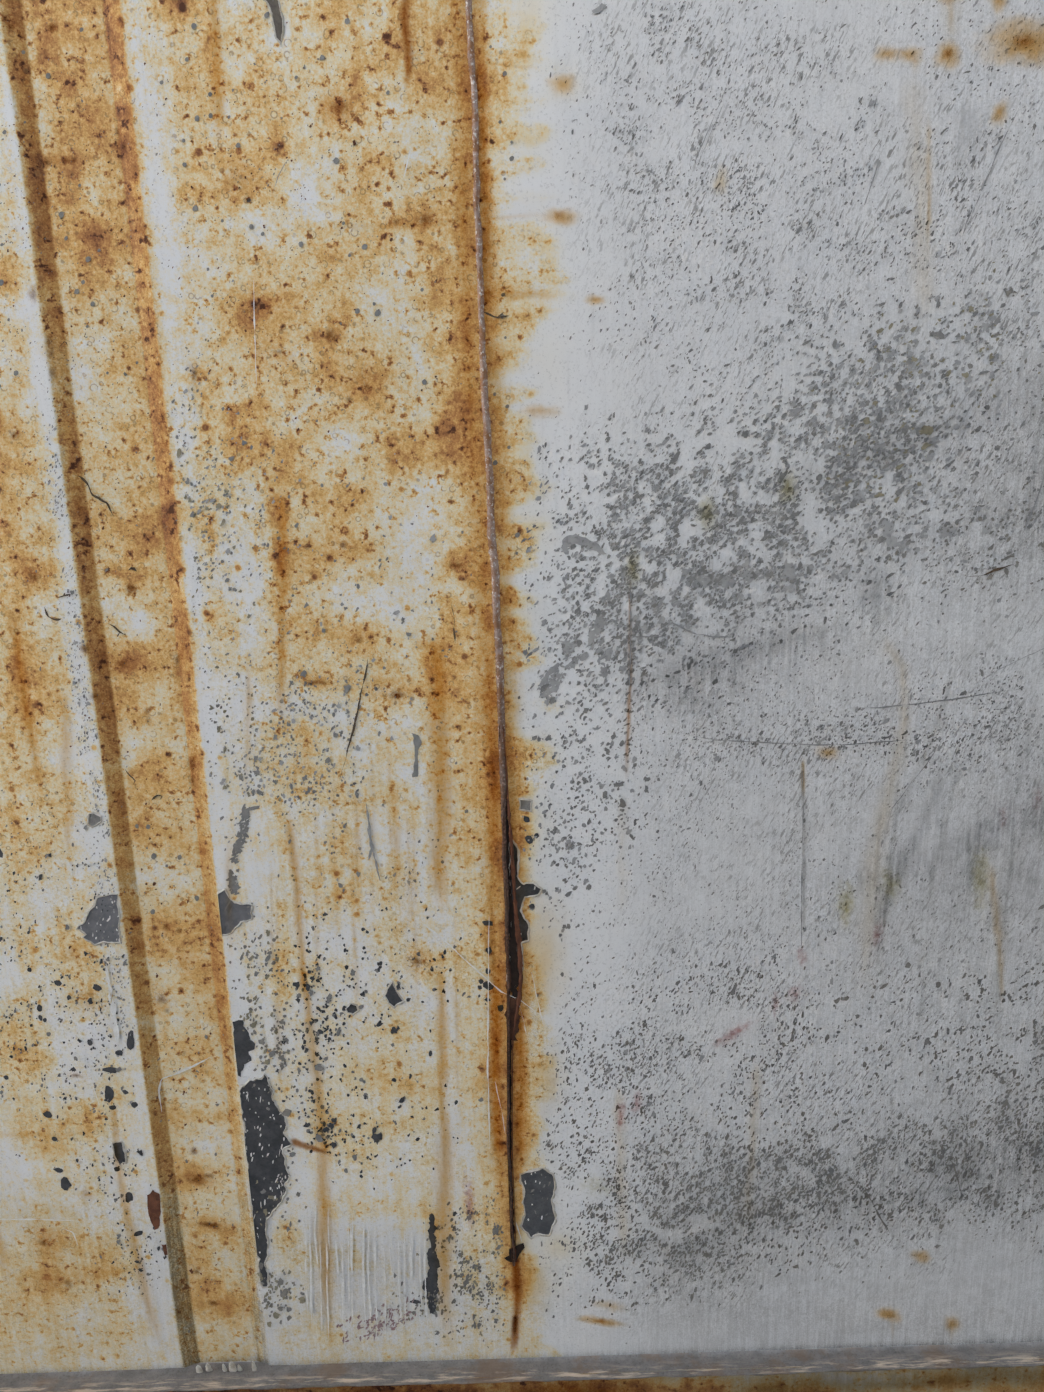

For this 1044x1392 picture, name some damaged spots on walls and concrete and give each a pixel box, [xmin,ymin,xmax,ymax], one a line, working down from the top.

peeling [0,0,288,1296]
peeling [145,96,506,1348]
spalling [295,13,402,105]
peeling [506,0,1044,1324]